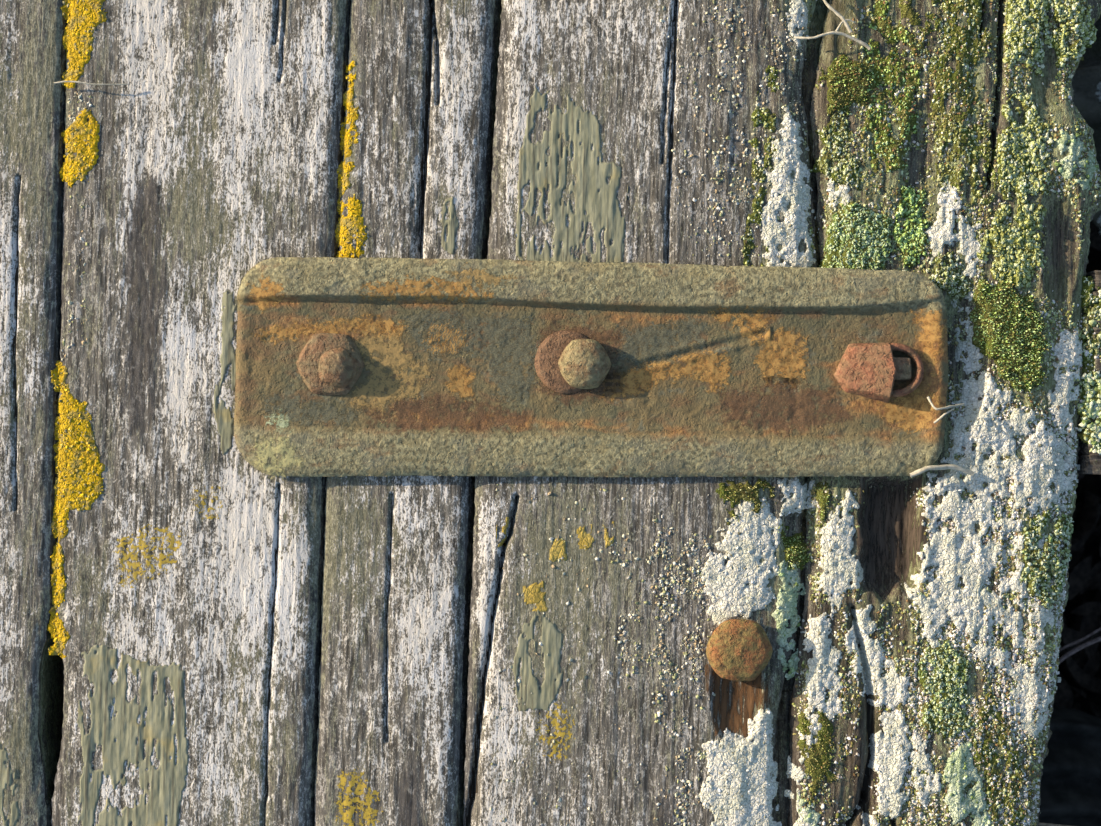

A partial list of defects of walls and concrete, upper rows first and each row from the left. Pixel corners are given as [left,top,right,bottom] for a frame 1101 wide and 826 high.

peeling [515,85,628,262]
rust [246,262,528,437]
rust [536,321,731,407]
rust [708,306,810,389]
rust [876,308,947,433]
peeling [77,645,188,826]
crack [466,496,517,826]
rust [705,663,772,742]